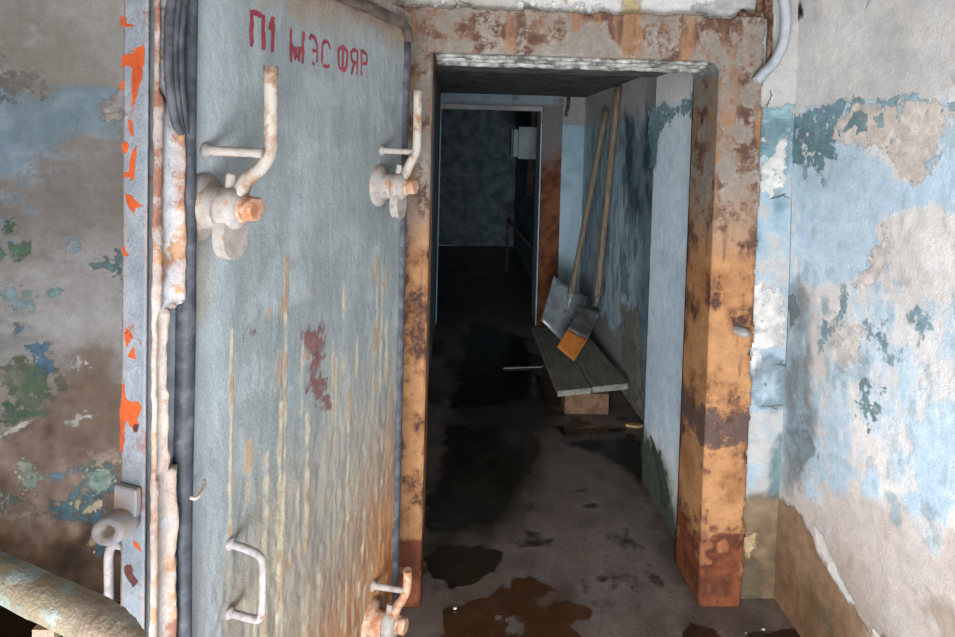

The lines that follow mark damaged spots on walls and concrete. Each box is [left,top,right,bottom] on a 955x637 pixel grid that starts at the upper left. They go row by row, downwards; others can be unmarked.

spalling [509,0,610,15]
peeling [100,45,145,181]
damp [625,115,634,186]
peeling [826,93,955,187]
peeling [125,194,142,216]
peeling [853,225,891,292]
damp [788,295,800,326]
peeling [825,311,868,374]
peeling [64,410,93,427]
damp [0,351,122,601]
damp [740,420,885,637]